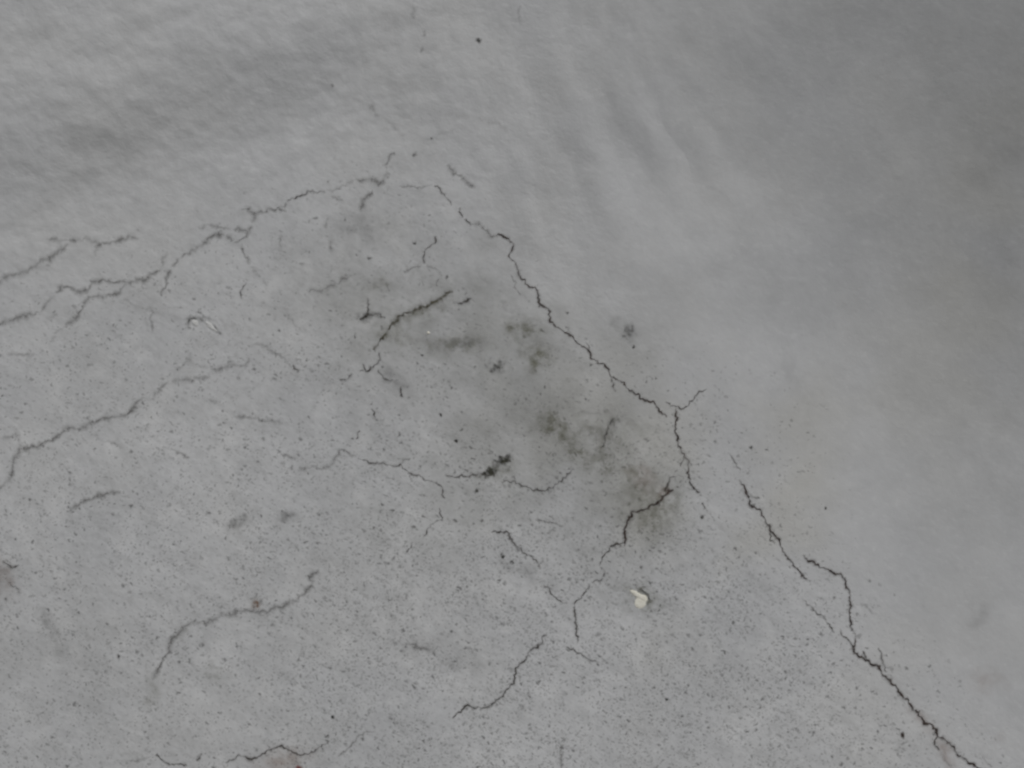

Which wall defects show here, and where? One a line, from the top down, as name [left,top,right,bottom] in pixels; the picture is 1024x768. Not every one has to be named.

crack [341,291,469,397]
crack [491,234,705,661]
crack [453,640,543,717]
crack [733,459,978,768]